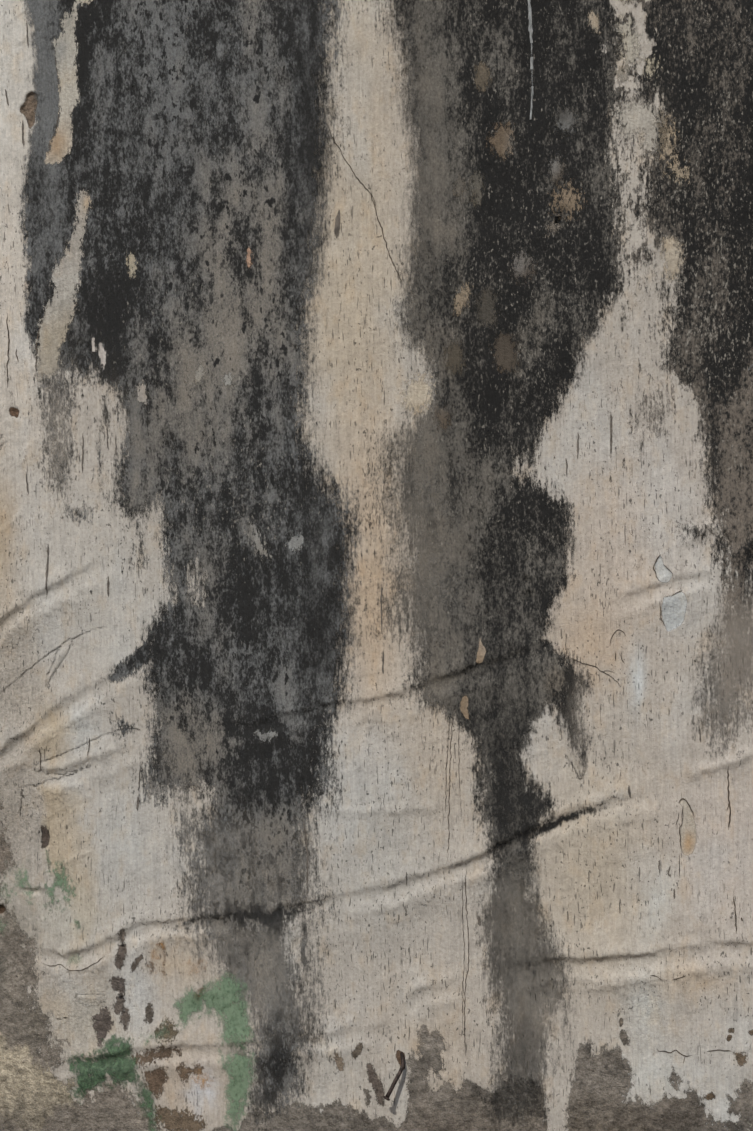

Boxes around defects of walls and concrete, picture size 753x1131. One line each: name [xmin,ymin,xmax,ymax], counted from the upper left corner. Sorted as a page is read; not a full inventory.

damp [20,0,383,1131]
damp [368,0,753,1126]
damp [7,861,76,904]
spalling [0,798,550,1131]
spalling [563,1018,753,1131]